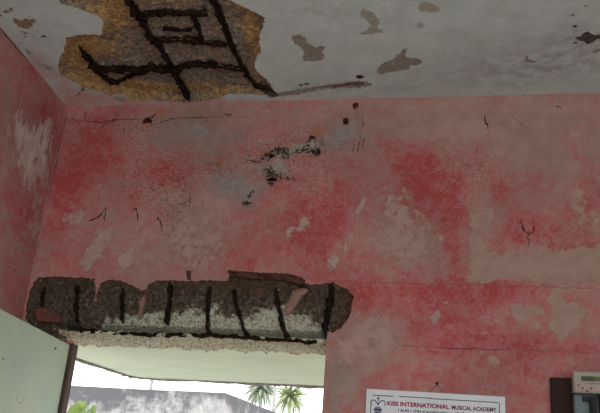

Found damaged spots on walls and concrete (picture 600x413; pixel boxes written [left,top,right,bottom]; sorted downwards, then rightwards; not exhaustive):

peeling [359,8,385,35]
spalling [58,0,278,103]
peeling [291,34,326,62]
peeling [377,48,422,74]
peeling [574,31,600,53]
leakage [267,81,371,99]
flaking render [252,138,324,186]
crack [33,111,245,277]
peeling [285,216,311,237]
spalling [25,226,354,356]